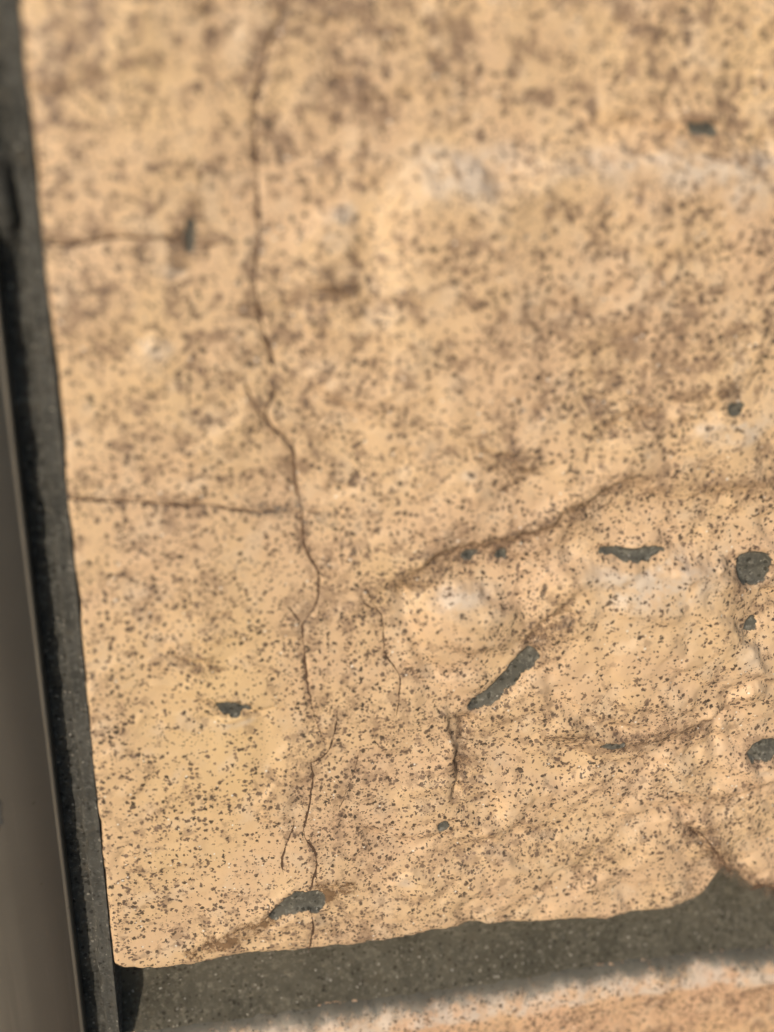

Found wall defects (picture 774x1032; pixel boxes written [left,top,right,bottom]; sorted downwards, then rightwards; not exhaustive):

crack [41,0,337,892]
crack [307,918,315,955]